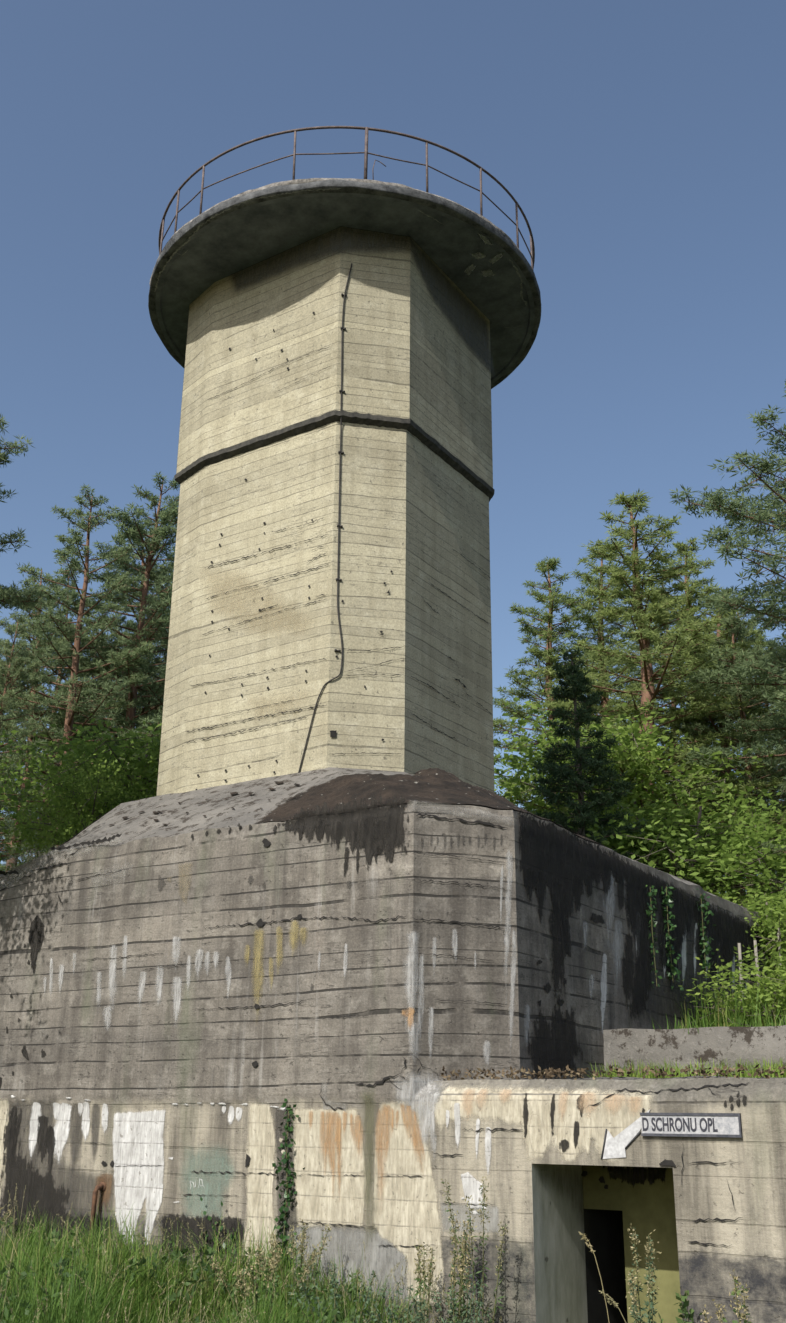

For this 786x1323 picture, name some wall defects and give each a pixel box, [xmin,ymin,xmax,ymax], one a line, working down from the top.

leakage [98,938,127,1024]
leakage [139,937,231,1014]
leakage [401,809,764,1172]
leakage [9,1102,112,1245]
rust [310,1112,360,1178]
leakage [161,1213,244,1255]